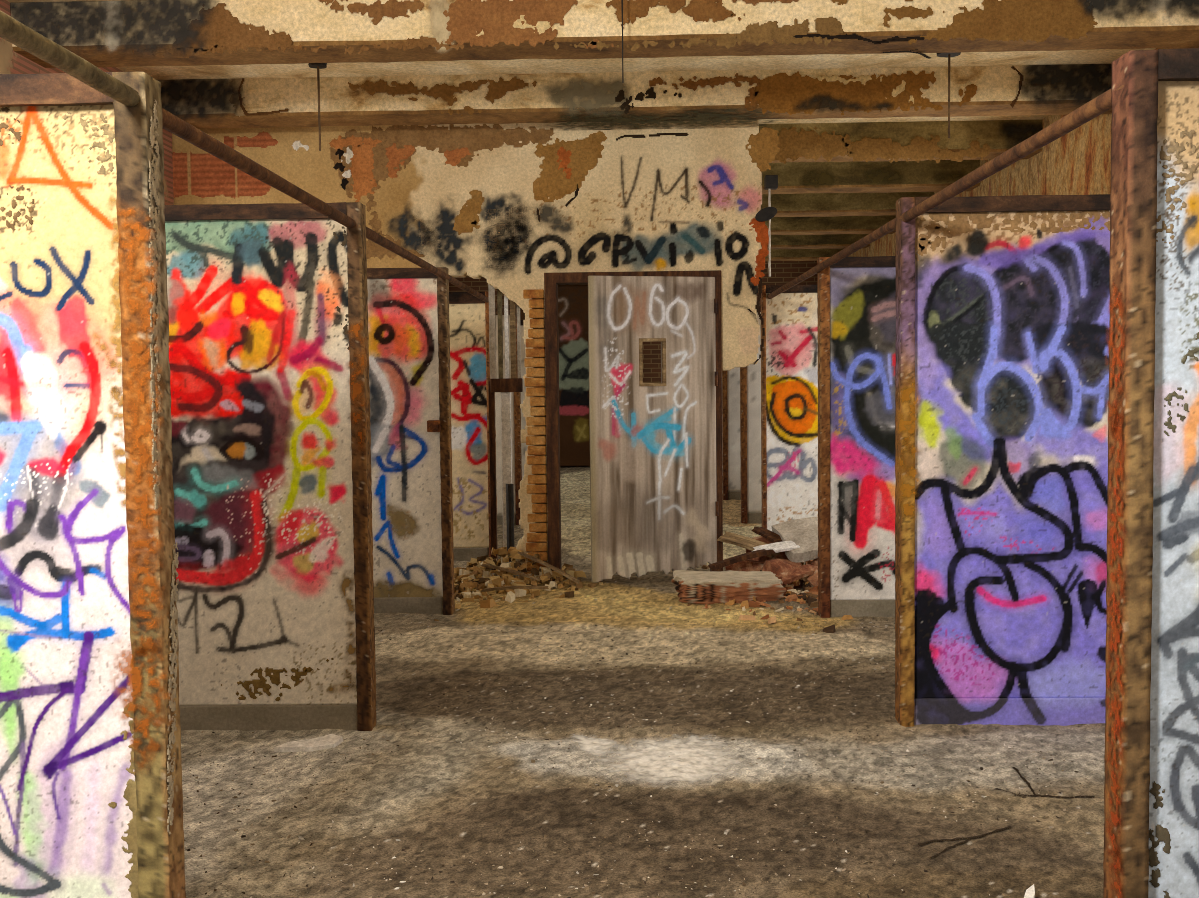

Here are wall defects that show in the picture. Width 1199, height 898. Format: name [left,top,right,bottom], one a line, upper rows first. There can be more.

peeling [132,0,847,58]
crack [793,33,931,59]
peeling [883,0,1098,45]
flaking render [329,76,607,260]
rust [94,198,165,766]
rust [348,323,366,449]
rust [898,382,919,516]
spalling [236,658,334,701]
rust [328,575,356,692]
rust [1107,288,1124,898]